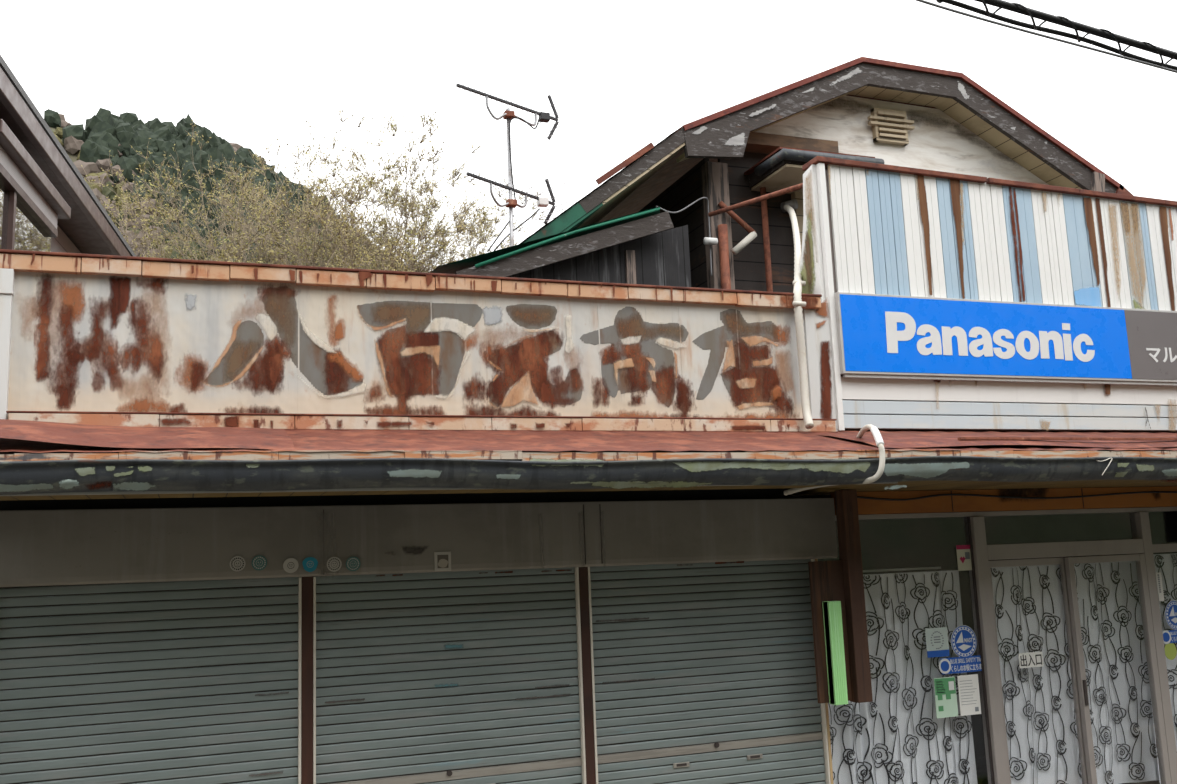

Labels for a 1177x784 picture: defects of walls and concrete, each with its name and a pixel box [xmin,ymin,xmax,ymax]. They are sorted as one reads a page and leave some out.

rust [916,175,932,295]
rust [950,179,965,299]
rust [1084,198,1145,307]
rust [1159,206,1175,311]
rust [26,258,191,424]
rust [236,336,290,392]
rust [365,327,444,427]
rust [464,330,709,429]
rust [724,327,795,430]
peeling [0,451,156,492]
peeling [387,469,442,479]
peeling [1115,463,1177,477]